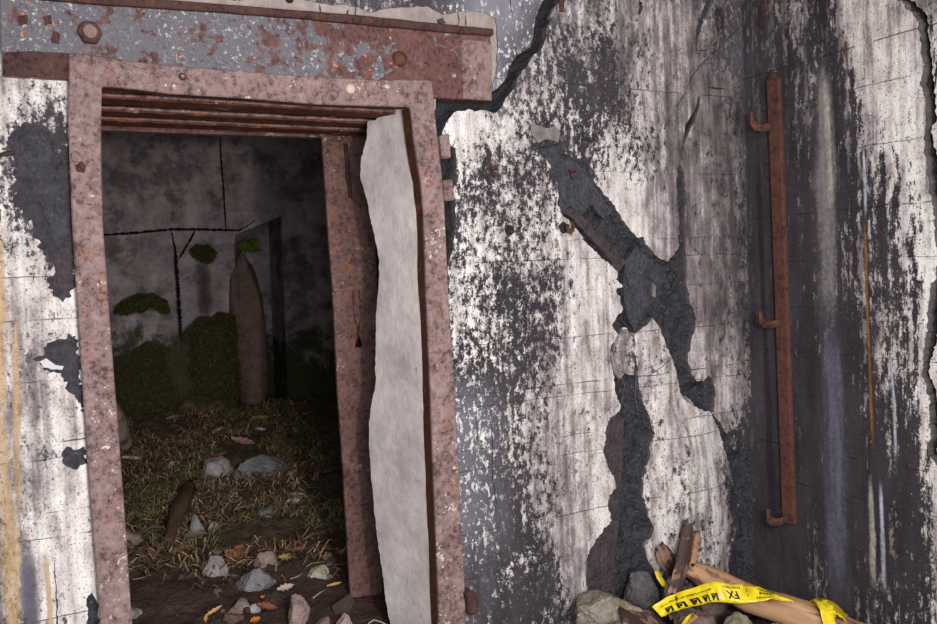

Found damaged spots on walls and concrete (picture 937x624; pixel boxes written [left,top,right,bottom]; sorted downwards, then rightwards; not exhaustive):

rust [43,15,60,44]
peeling [6,122,76,302]
crack [434,0,558,277]
water stain [816,71,837,300]
crack [898,0,937,465]
peeling [34,333,84,412]
peeling [62,446,87,470]
crack [476,411,497,517]
water stain [823,341,847,585]
efflorescence [869,486,885,586]
spalling [86,593,100,624]